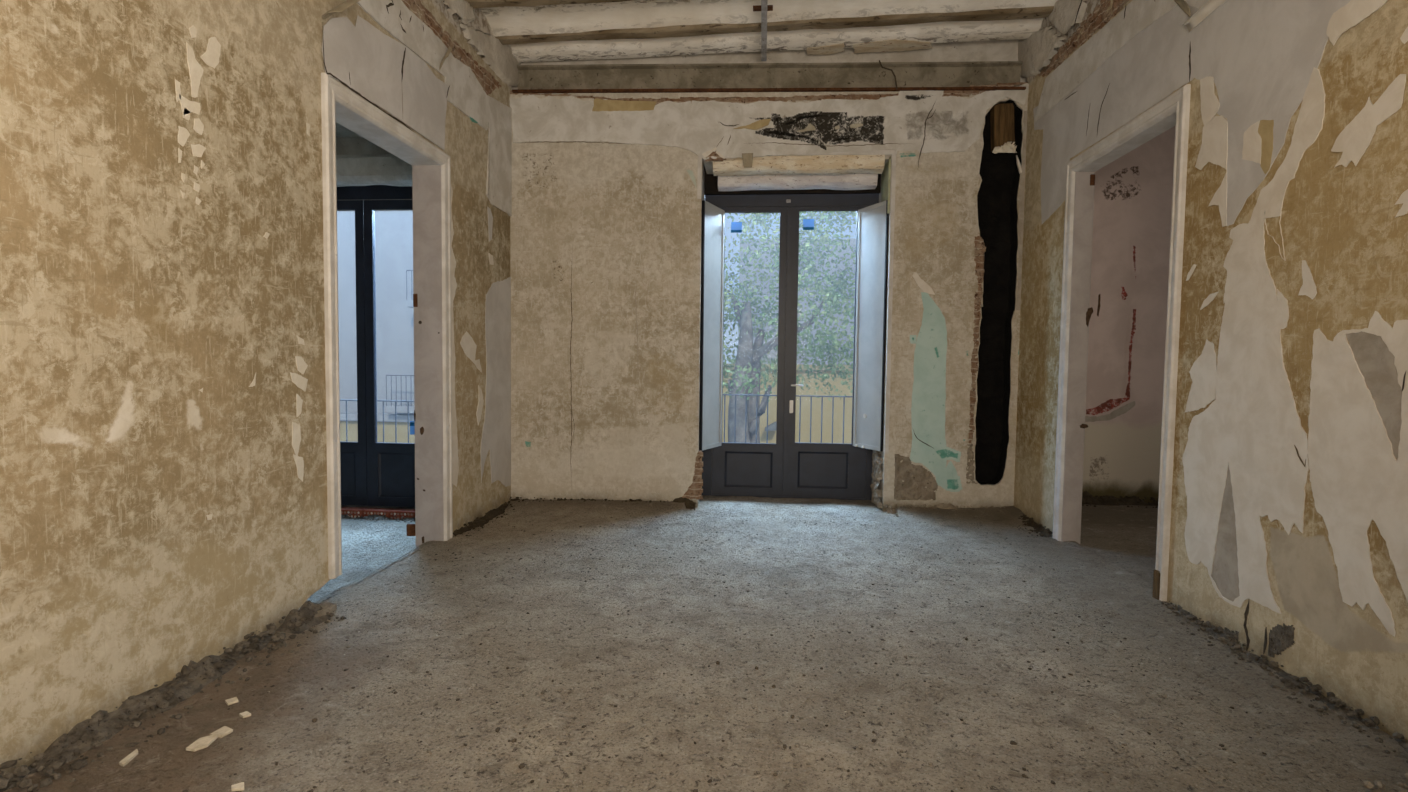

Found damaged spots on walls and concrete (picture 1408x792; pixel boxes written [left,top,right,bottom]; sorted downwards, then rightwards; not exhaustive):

crack [386,0,424,33]
flaking render [402,0,898,105]
flaking render [702,147,726,161]
peeling [1346,331,1402,459]
flaking render [1211,465,1408,662]